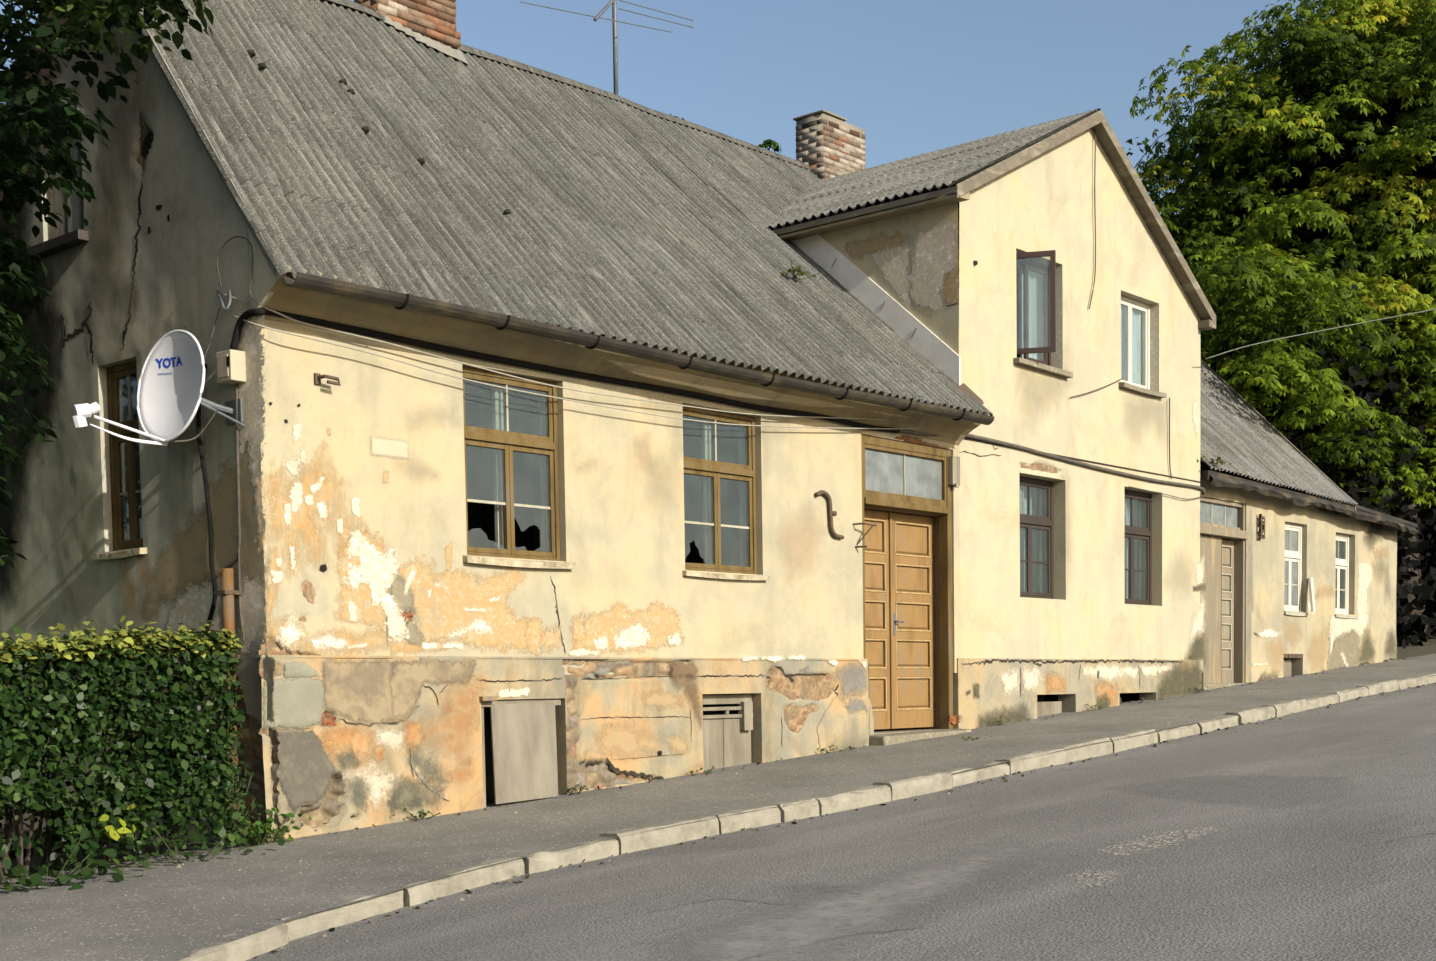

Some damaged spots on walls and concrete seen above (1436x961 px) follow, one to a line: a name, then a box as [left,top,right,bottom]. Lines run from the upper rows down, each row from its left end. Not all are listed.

crack [60,182,143,365]
peeling [869,217,978,314]
flaking render [140,306,500,750]
peeling [1193,560,1204,585]
peeling [1328,560,1373,667]
peeling [498,688,529,697]
crack [339,579,839,801]
flaking render [562,620,696,793]
flaking render [743,654,838,733]
peeling [1001,665,1041,696]
peeling [1083,664,1173,680]
flaking render [217,685,399,840]